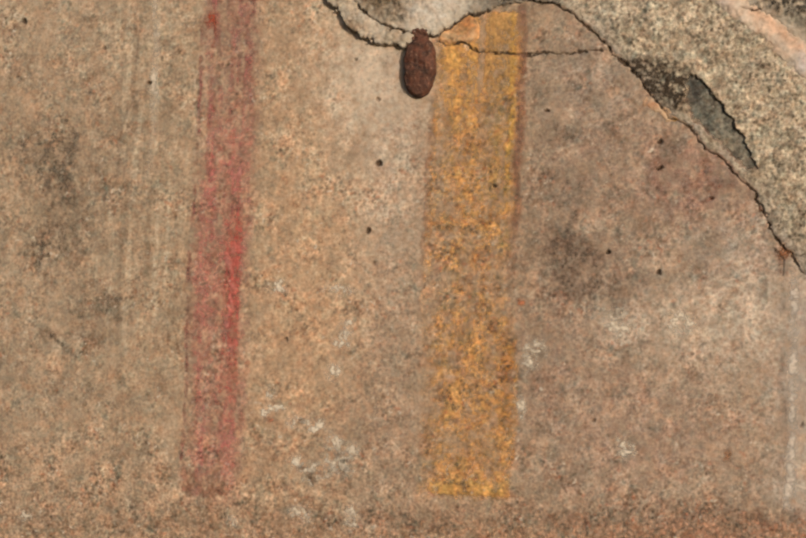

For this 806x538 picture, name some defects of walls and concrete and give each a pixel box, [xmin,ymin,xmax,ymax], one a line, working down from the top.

crack [358,4,407,34]
crack [432,12,550,58]
crack [531,0,799,274]
spalling [686,75,754,169]